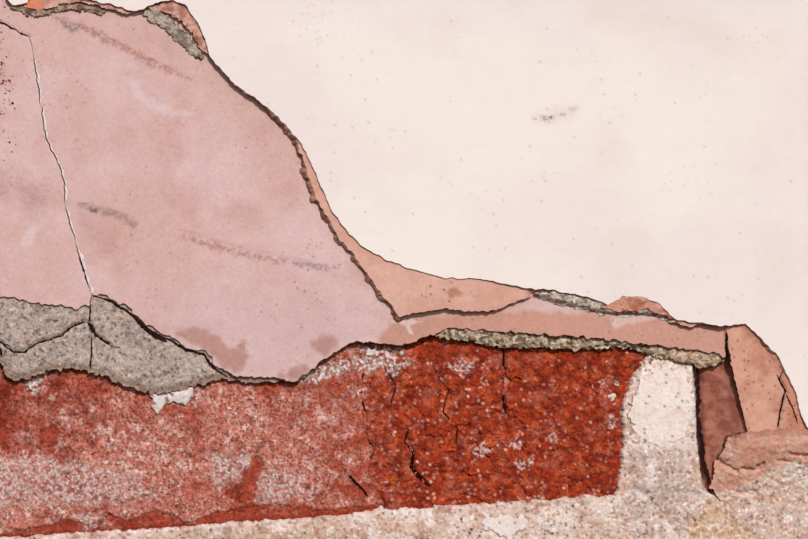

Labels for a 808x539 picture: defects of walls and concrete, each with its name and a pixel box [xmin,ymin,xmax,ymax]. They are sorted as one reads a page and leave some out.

flaking render [10,0,132,18]
flaking render [142,0,209,59]
crack [0,21,228,377]
flaking render [292,139,704,327]
spalling [0,294,282,414]
crack [348,475,382,499]
crack [404,431,430,487]
crack [439,378,458,443]
crack [502,349,510,414]
spalling [354,324,807,539]